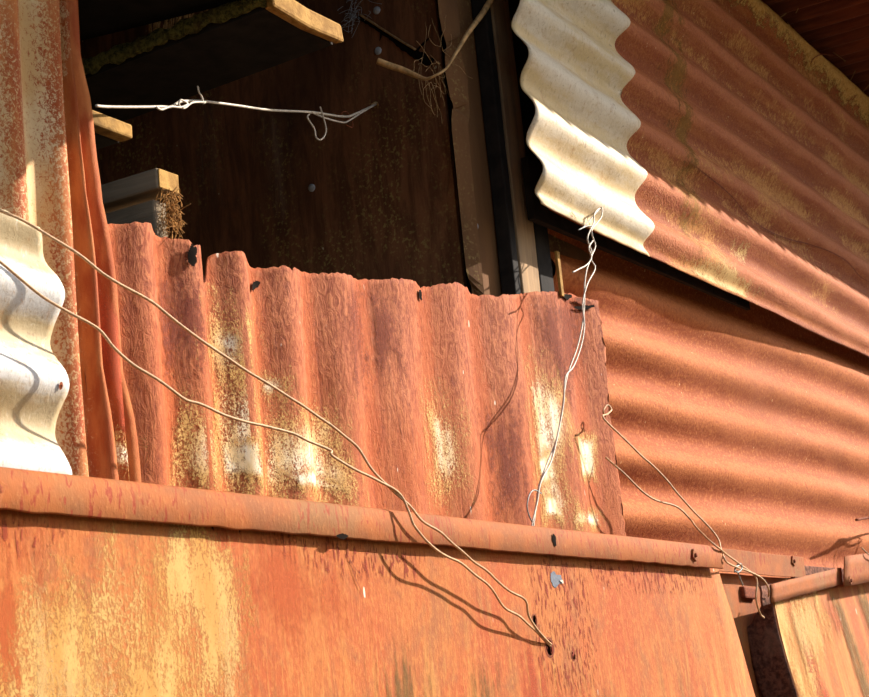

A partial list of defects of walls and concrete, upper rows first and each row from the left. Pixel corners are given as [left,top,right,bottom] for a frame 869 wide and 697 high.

rust [101,306,126,434]
rust [159,282,205,375]
rust [535,299,587,407]
rust [479,406,529,512]